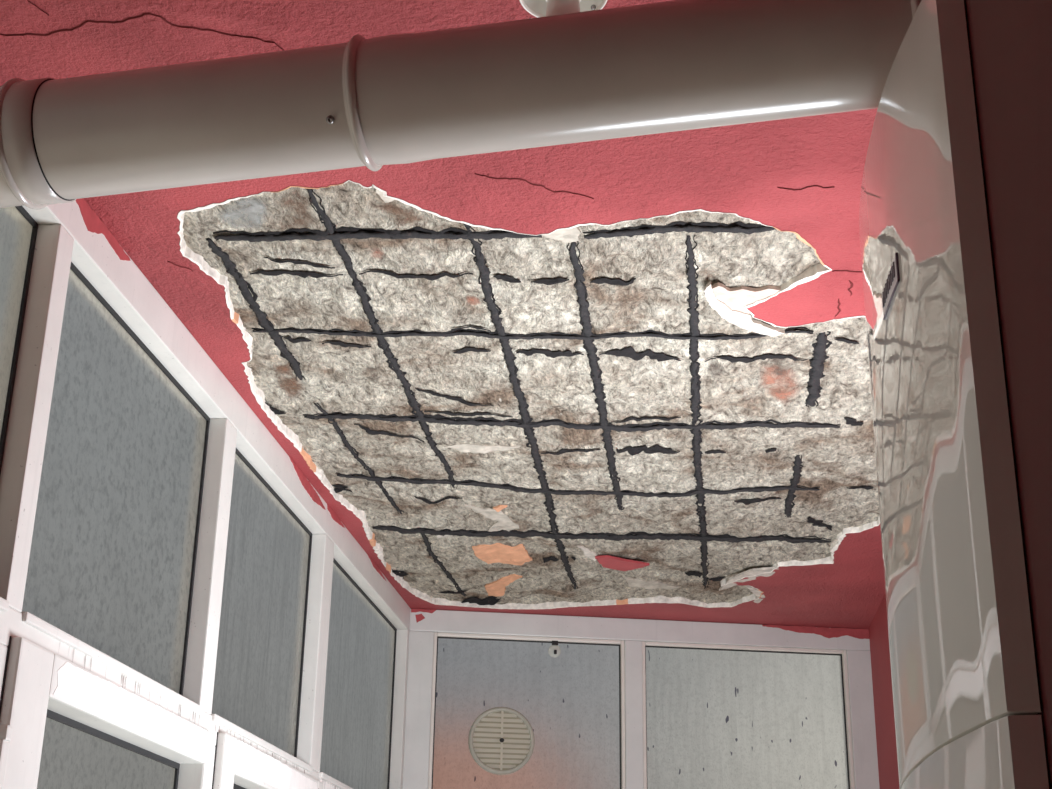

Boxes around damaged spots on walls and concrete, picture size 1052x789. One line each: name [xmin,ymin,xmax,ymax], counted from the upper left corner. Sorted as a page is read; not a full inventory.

crack [0,0,284,50]
crack [475,173,594,199]
spalling [177,180,880,622]